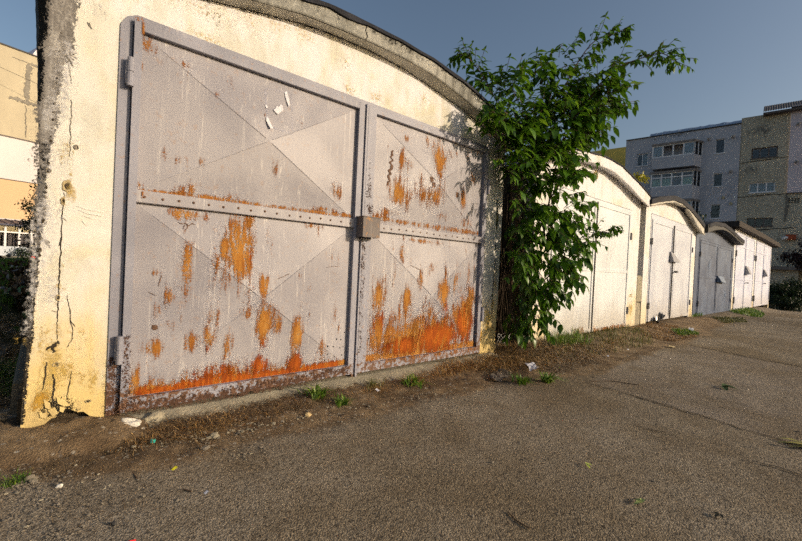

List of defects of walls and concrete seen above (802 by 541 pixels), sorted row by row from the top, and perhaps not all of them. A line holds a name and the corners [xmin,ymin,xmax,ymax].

rust [168,207,209,221]
rust [139,184,352,218]
rust [102,214,351,417]